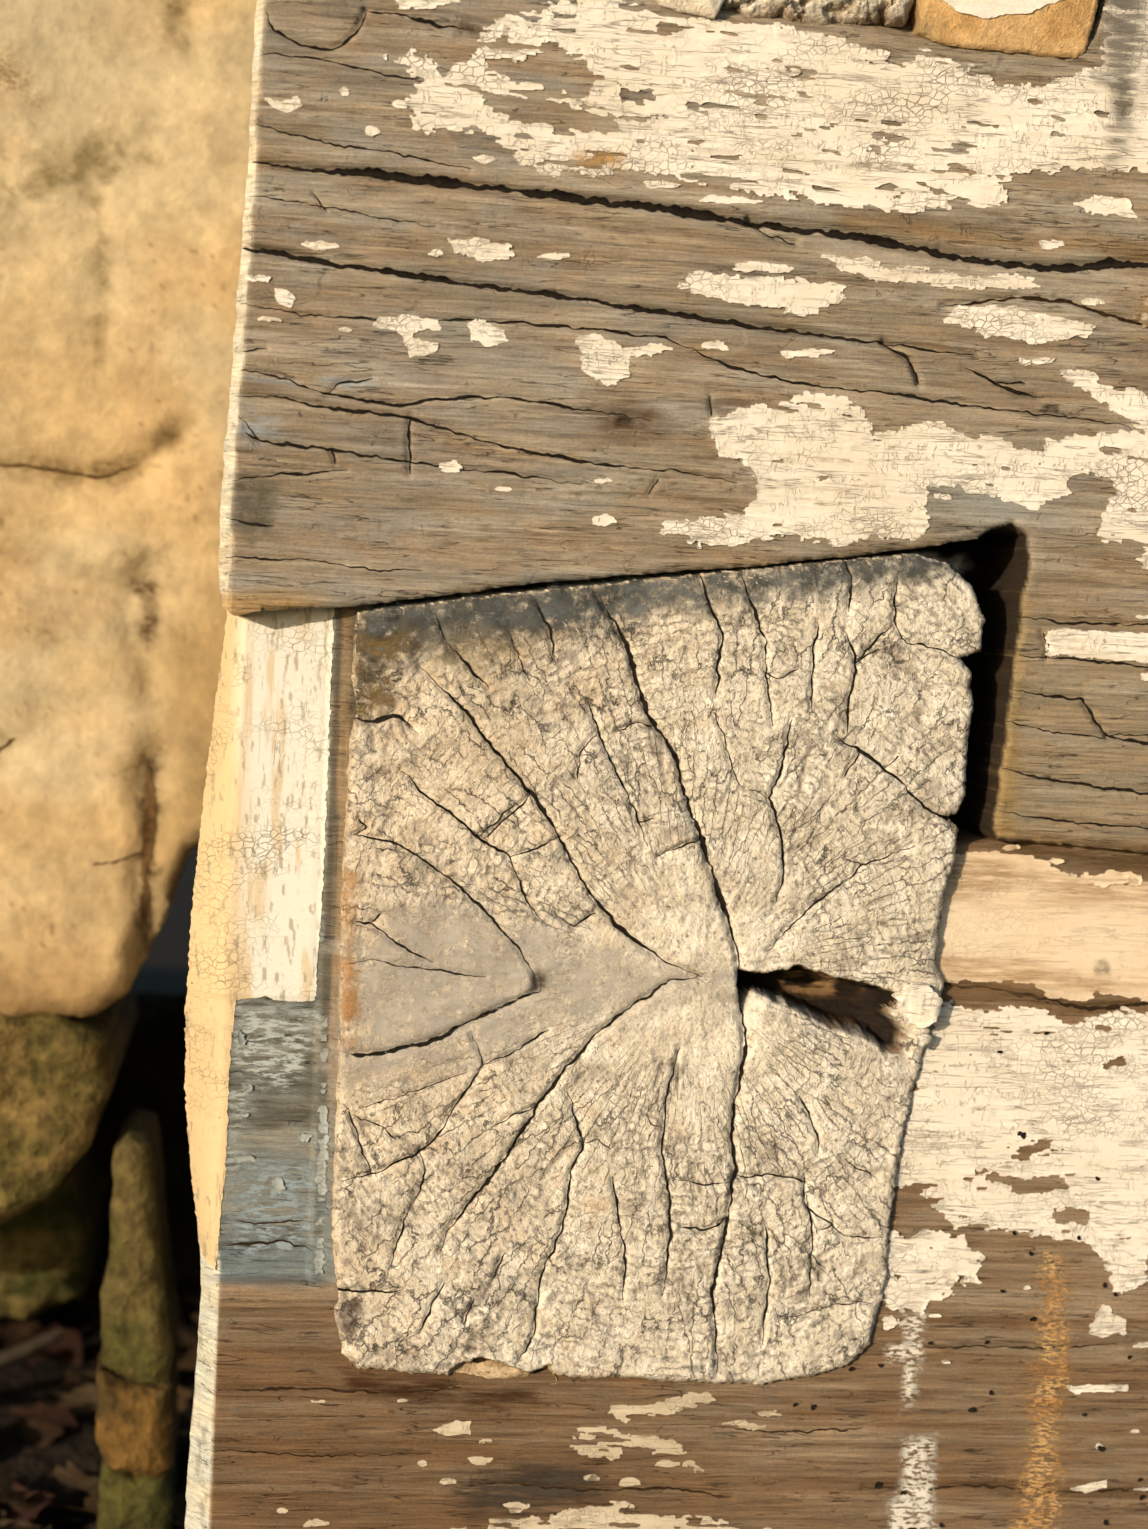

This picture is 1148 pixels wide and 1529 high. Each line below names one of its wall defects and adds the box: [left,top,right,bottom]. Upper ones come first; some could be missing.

spalling [655,0,724,20]
peeling [942,0,1060,19]